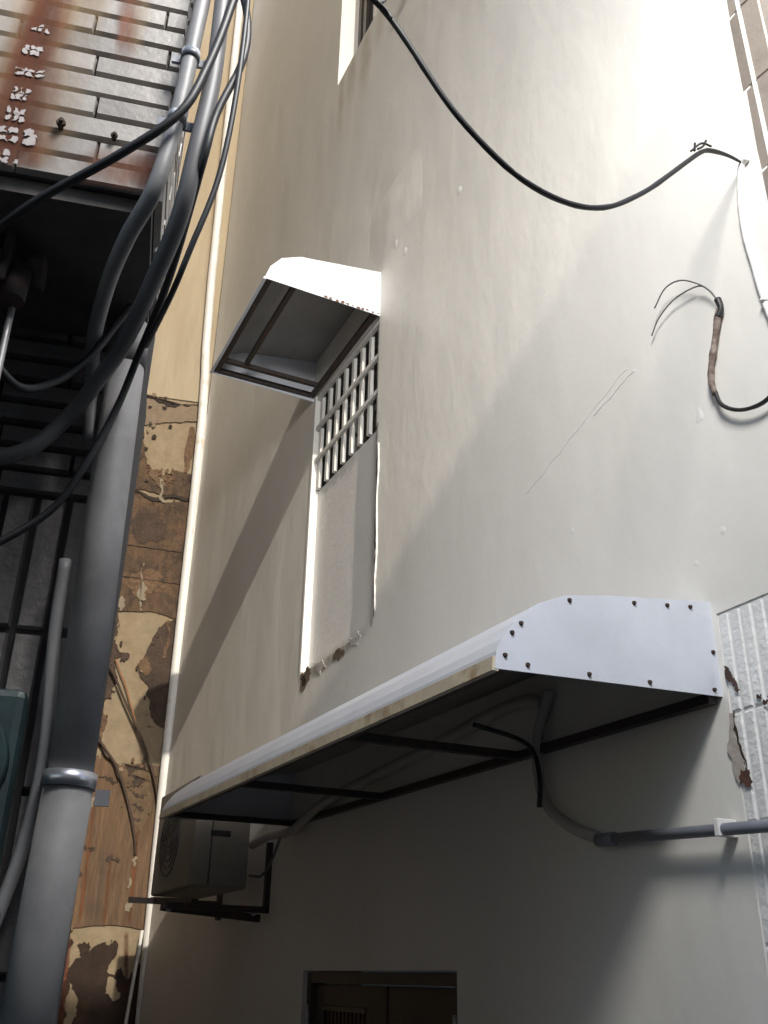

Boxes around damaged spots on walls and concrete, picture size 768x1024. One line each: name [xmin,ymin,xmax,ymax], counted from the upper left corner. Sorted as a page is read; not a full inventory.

corrosion [0,0,64,163]
peeling [71,393,208,936]